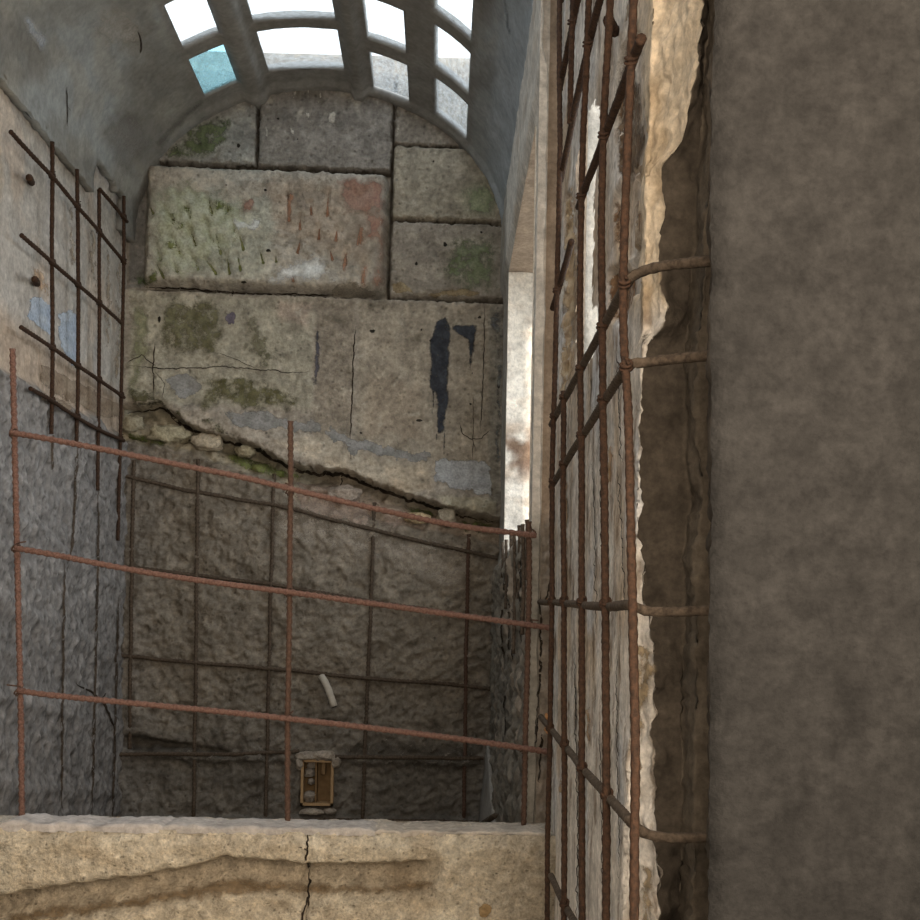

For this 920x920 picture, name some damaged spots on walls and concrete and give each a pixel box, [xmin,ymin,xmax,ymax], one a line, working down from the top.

rust [342,179,383,255]
water stain [273,259,324,281]
crack [128,309,493,523]
spalling [8,129,529,822]
spalling [537,0,711,920]
crack [299,835,312,920]
spalling [479,904,492,917]